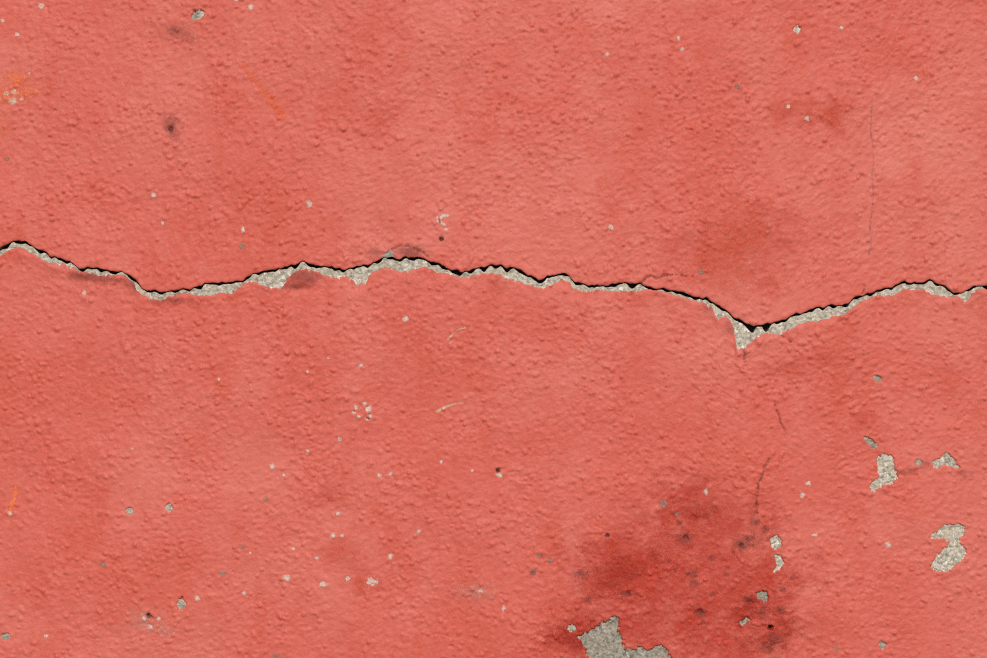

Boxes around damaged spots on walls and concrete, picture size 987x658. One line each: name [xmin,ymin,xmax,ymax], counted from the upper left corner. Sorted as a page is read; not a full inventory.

crack [0,240,987,350]
peeling [864,437,898,493]
peeling [914,452,960,469]
peeling [931,523,966,573]
peeling [567,616,671,658]